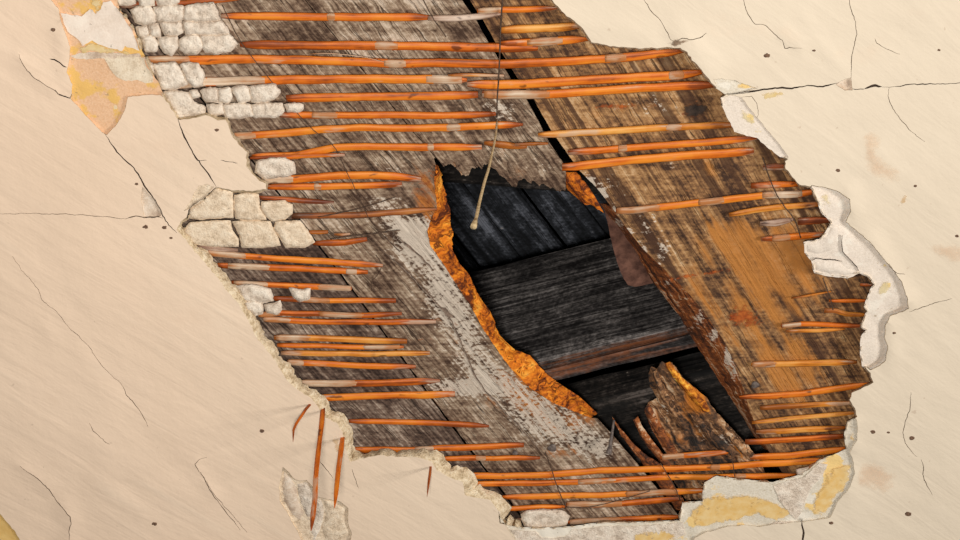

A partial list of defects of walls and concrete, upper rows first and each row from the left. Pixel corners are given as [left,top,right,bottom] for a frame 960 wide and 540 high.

flaking render [51,0,163,135]
crack [644,0,706,41]
flaking render [714,79,788,158]
flaking render [836,78,852,90]
crack [732,0,960,142]
crack [9,120,235,233]
flaking render [135,183,173,239]
flaking render [804,186,908,370]
crack [12,256,148,426]
flaking render [279,468,351,540]
flaking render [499,418,858,540]